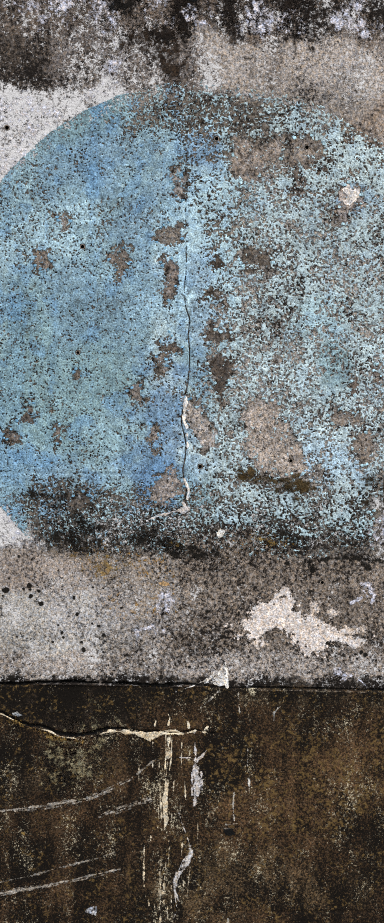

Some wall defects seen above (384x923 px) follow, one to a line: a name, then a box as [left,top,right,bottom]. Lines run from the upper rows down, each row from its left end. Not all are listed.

leakage [14,0,211,101]
leakage [226,0,384,58]
peeling [230,130,327,189]
peeling [106,245,132,277]
peeling [154,221,185,302]
peeling [240,397,311,479]
leakage [25,484,111,554]
leakage [124,478,233,566]
leakage [248,529,311,552]
leakage [274,479,312,503]
spalling [224,584,375,658]
crack [0,678,384,737]